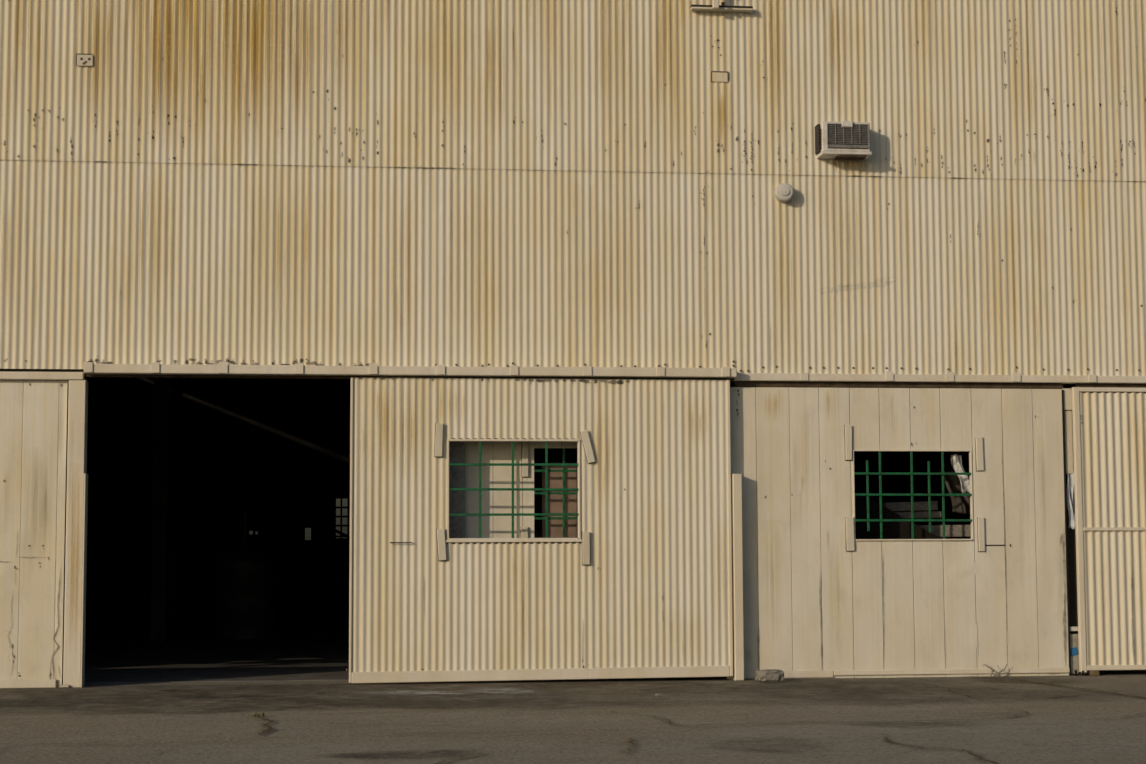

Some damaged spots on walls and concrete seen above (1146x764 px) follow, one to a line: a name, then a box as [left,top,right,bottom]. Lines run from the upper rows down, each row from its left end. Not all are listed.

corrosion [152,0,204,81]
corrosion [234,0,272,79]
crack [799,720,999,764]